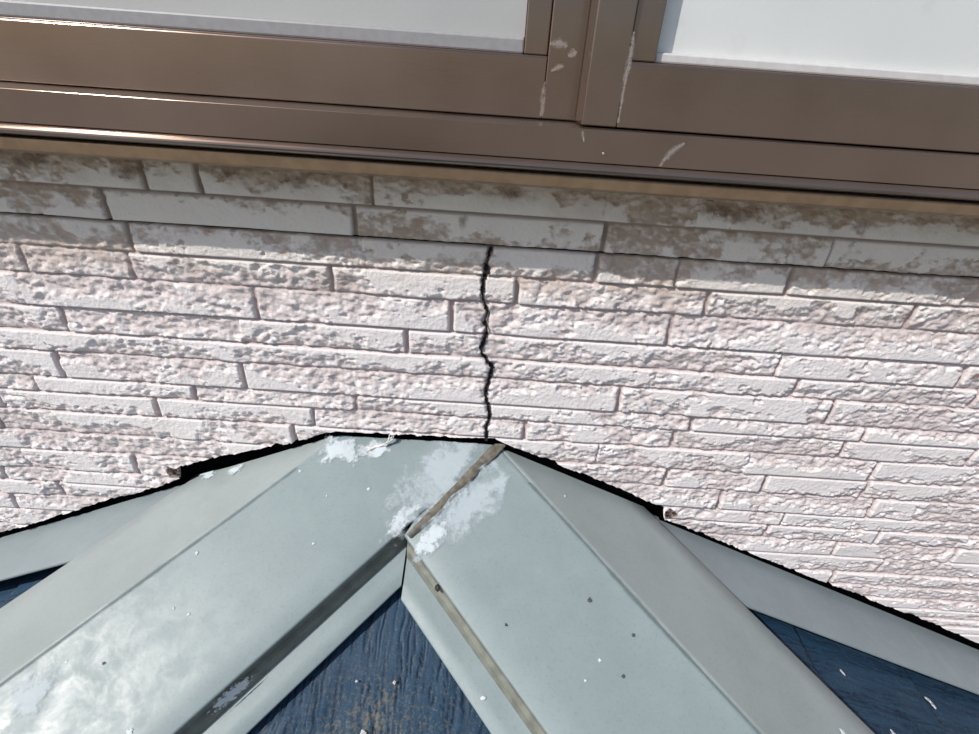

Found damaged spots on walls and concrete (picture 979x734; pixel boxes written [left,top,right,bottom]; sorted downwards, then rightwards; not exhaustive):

crack [479,246,494,441]